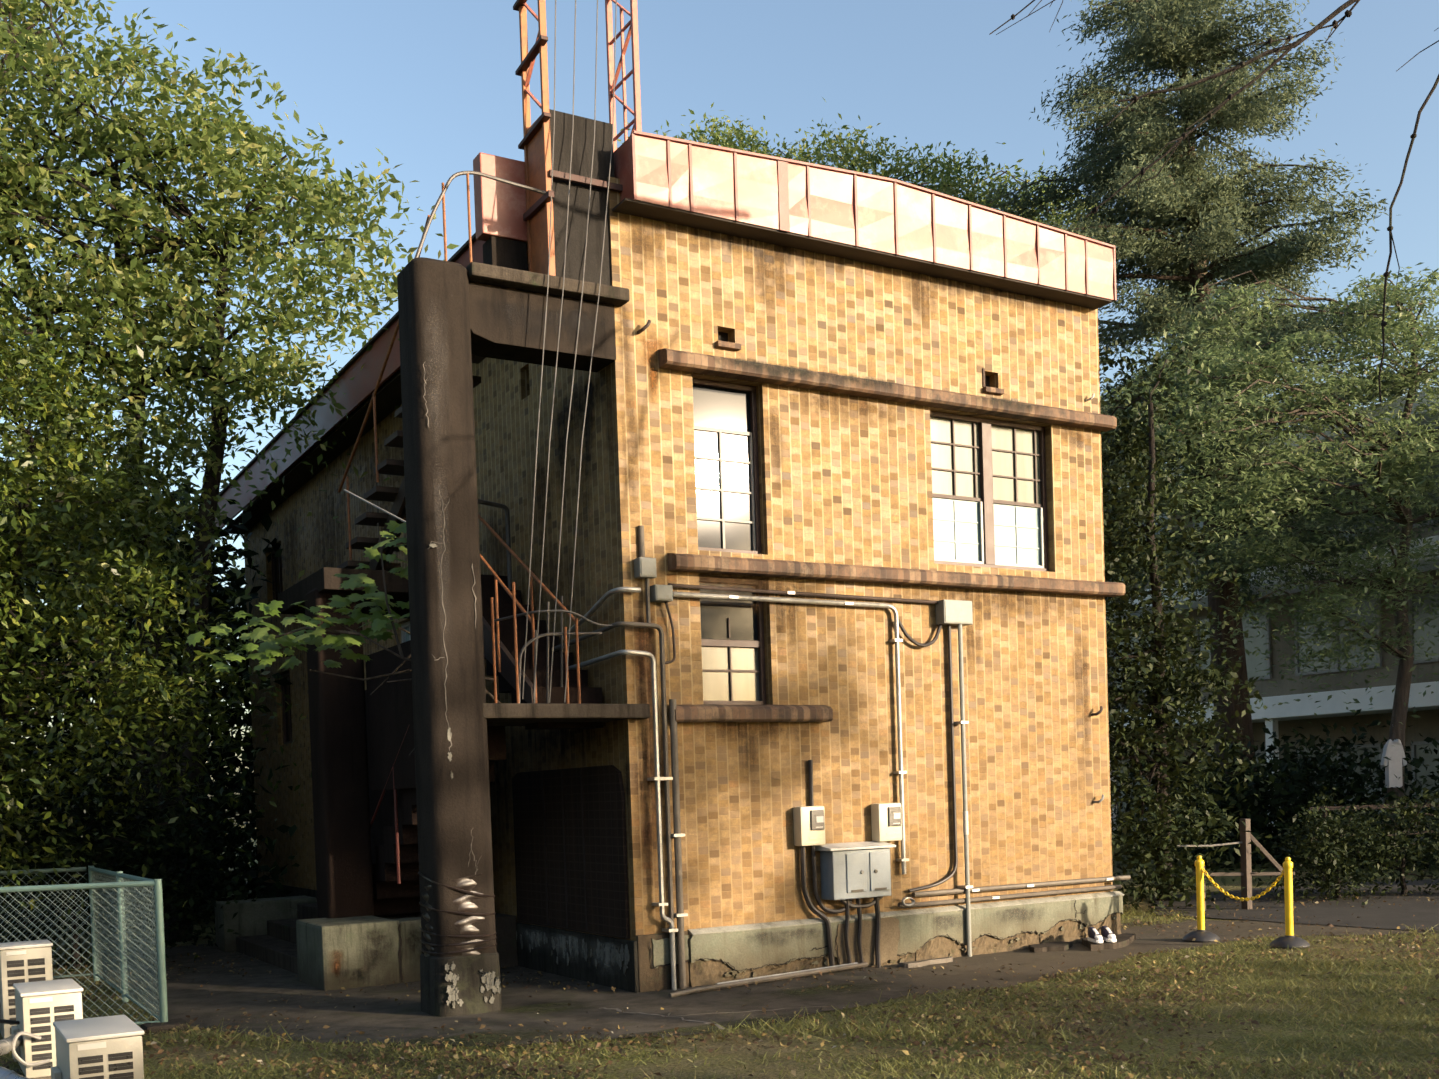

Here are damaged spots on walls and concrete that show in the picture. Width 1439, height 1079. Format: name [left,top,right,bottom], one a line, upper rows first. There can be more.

crack [428,490,477,751]
peeling [649,912,1121,987]